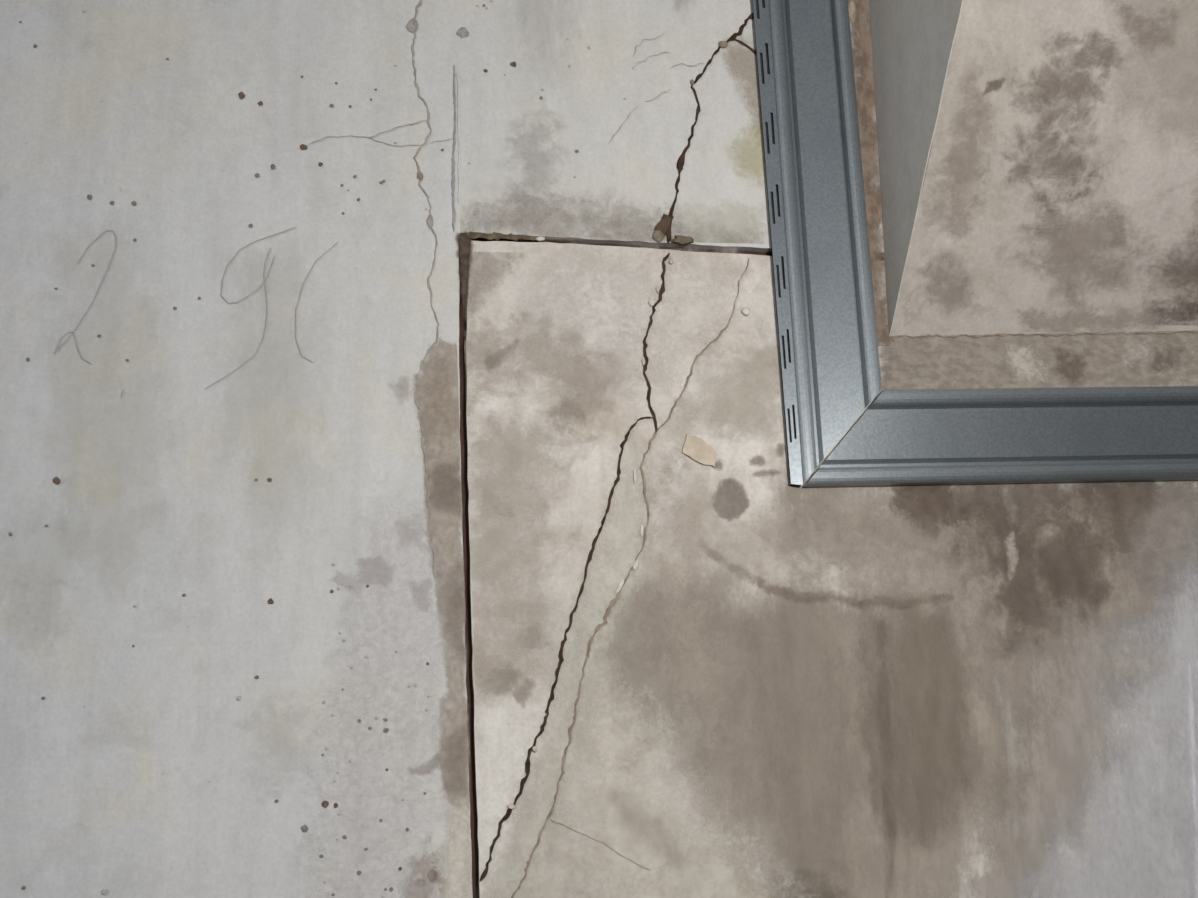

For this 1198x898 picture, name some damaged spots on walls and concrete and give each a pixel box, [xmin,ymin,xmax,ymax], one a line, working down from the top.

crack [307,0,460,578]
water stain [442,798,471,898]
crack [480,12,757,898]
water stain [495,453,1198,898]
water stain [848,0,1198,391]